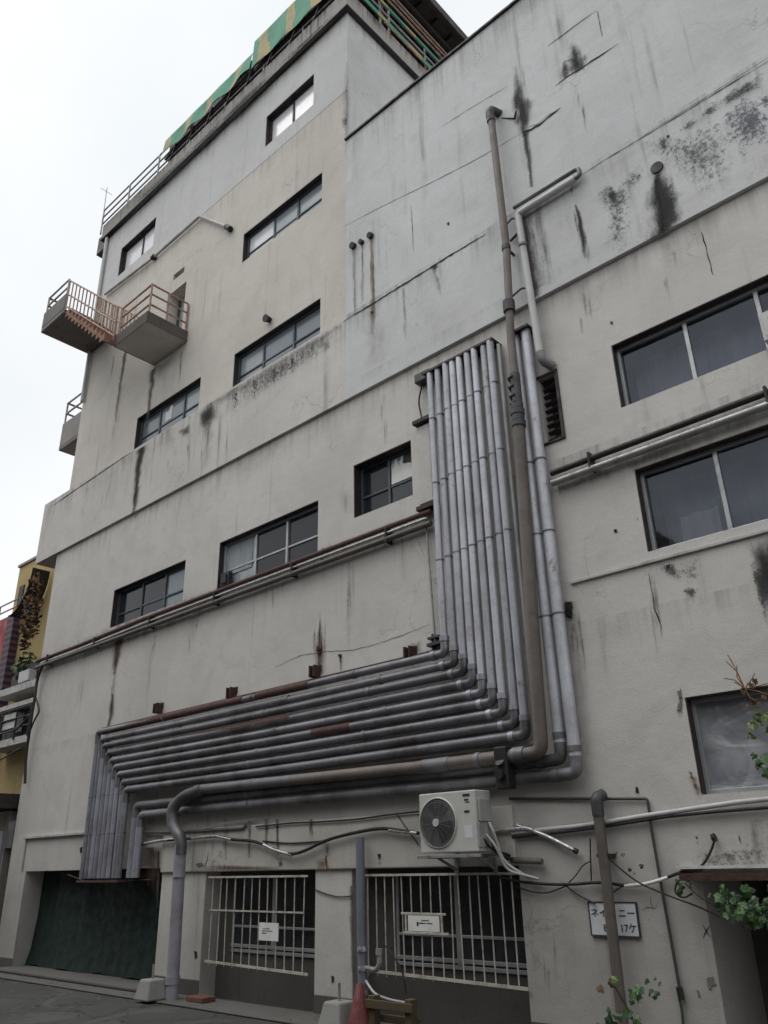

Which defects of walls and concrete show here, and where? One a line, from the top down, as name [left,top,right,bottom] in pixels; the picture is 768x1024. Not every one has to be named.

damp [562,48,583,77]
damp [514,81,532,186]
damp [659,83,768,177]
damp [575,205,585,251]
damp [599,174,640,250]
damp [652,173,677,238]
damp [234,344,320,407]
damp [201,407,213,424]
damp [133,446,145,512]
damp [754,548,768,607]